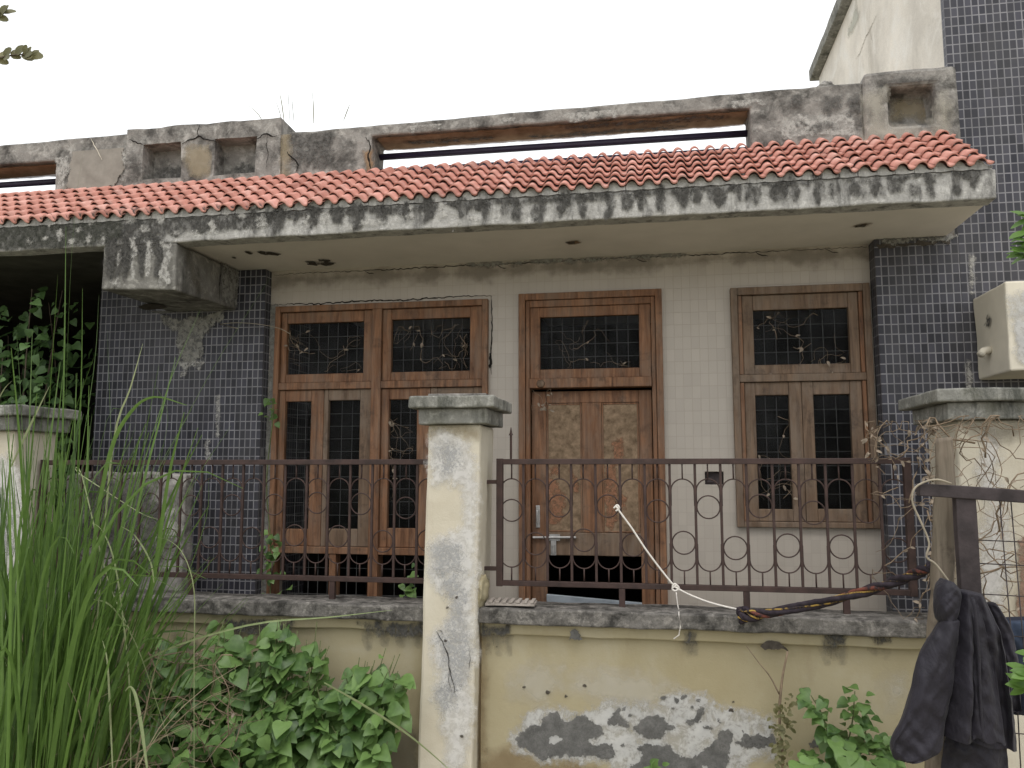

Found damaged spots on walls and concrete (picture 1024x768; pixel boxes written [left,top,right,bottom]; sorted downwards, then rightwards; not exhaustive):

leakage [159,165,181,178]
crack [257,133,299,171]
leakage [290,132,335,169]
leakage [249,170,981,236]
leakage [103,236,171,287]
crack [436,630,471,692]
peeling [509,692,776,768]